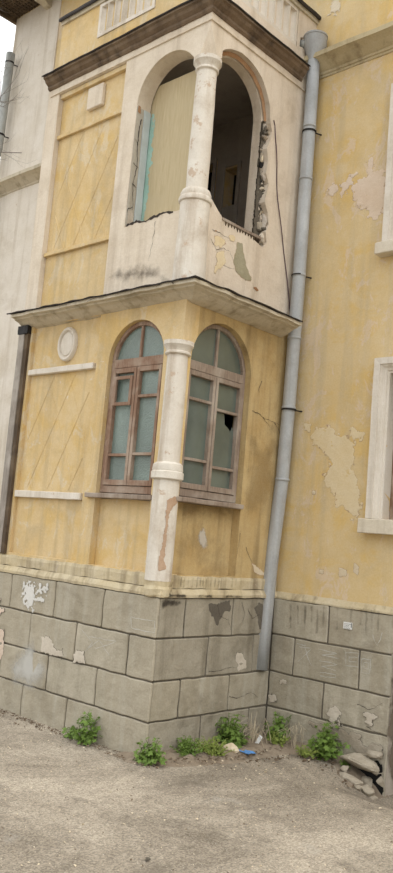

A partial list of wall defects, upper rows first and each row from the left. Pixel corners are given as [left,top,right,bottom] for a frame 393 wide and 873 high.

spalling [222,51,270,246]
peeling [325,157,386,220]
flaking render [214,230,259,291]
peeling [304,423,365,521]
peeling [158,496,177,571]
peeling [21,580,48,613]
spalling [38,636,85,664]
spalling [235,652,246,671]
spalling [308,705,384,795]